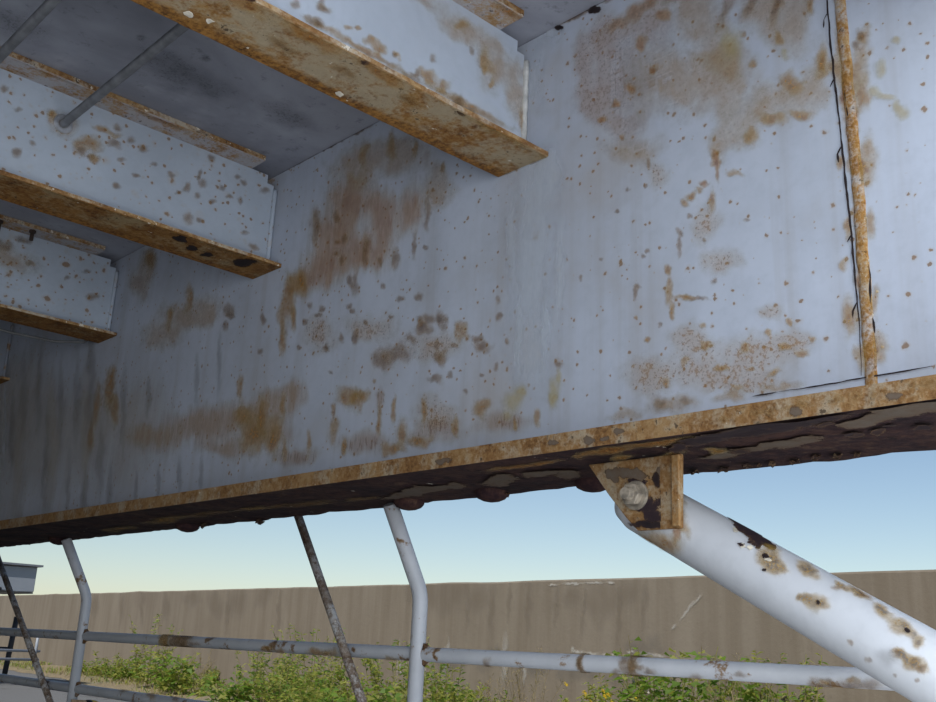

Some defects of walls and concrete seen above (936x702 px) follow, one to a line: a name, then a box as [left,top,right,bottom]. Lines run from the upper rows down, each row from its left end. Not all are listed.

corrosion [555,5,601,30]
corrosion [323,26,397,86]
corrosion [454,96,493,129]
crack [755,0,931,396]
corrosion [172,235,213,257]
corrosion [233,259,257,267]
corrosion [631,319,814,395]
corrosion [342,392,458,452]
peeling [668,392,936,473]
peeling [382,482,467,500]
peeling [480,470,581,497]
peeling [605,466,660,483]